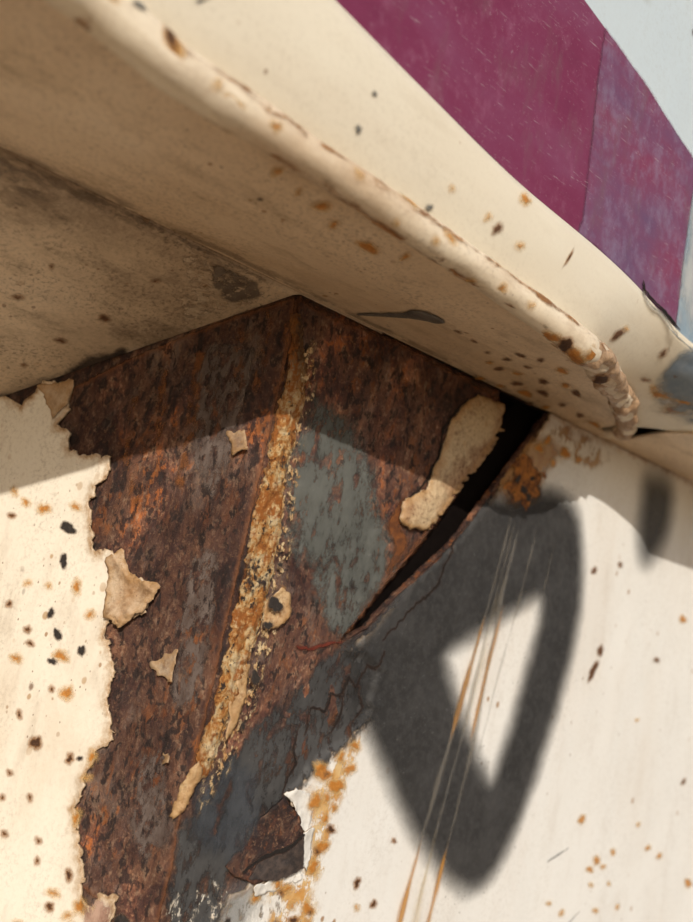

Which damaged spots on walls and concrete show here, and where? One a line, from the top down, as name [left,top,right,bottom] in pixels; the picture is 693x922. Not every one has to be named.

corrosion [165,27,181,56]
peeling [5,256,505,578]
corrosion [499,426,600,511]
corrosion [543,328,628,397]
corrosion [28,737,41,750]
peeling [103,493,168,658]
peeling [140,348,290,765]
peeling [159,714,358,922]
corrosion [58,298,565,922]
crack [282,397,542,797]
corrosion [588,645,603,681]
peeling [83,889,129,922]